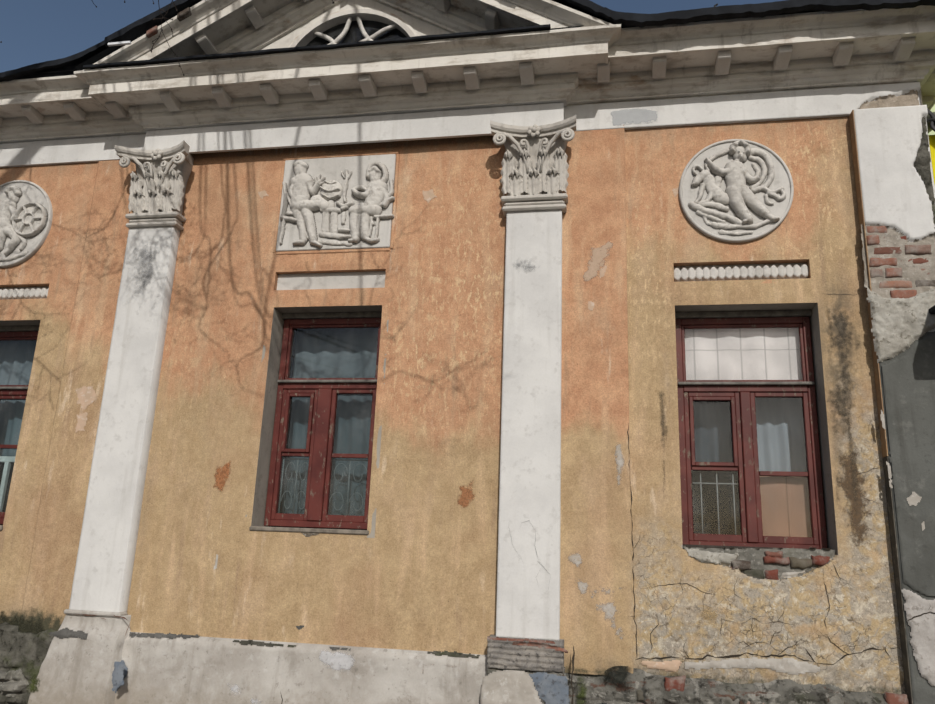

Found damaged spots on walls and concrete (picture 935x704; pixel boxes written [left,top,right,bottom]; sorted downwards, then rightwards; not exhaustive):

flaking render [859,90,919,109]
flaking render [861,116,935,363]
peeling [583,241,613,281]
peeling [213,462,230,491]
peeling [458,482,474,507]
crack [627,423,935,665]
flaking render [683,546,835,580]
peeling [112,660,128,693]
flaking render [602,660,909,704]